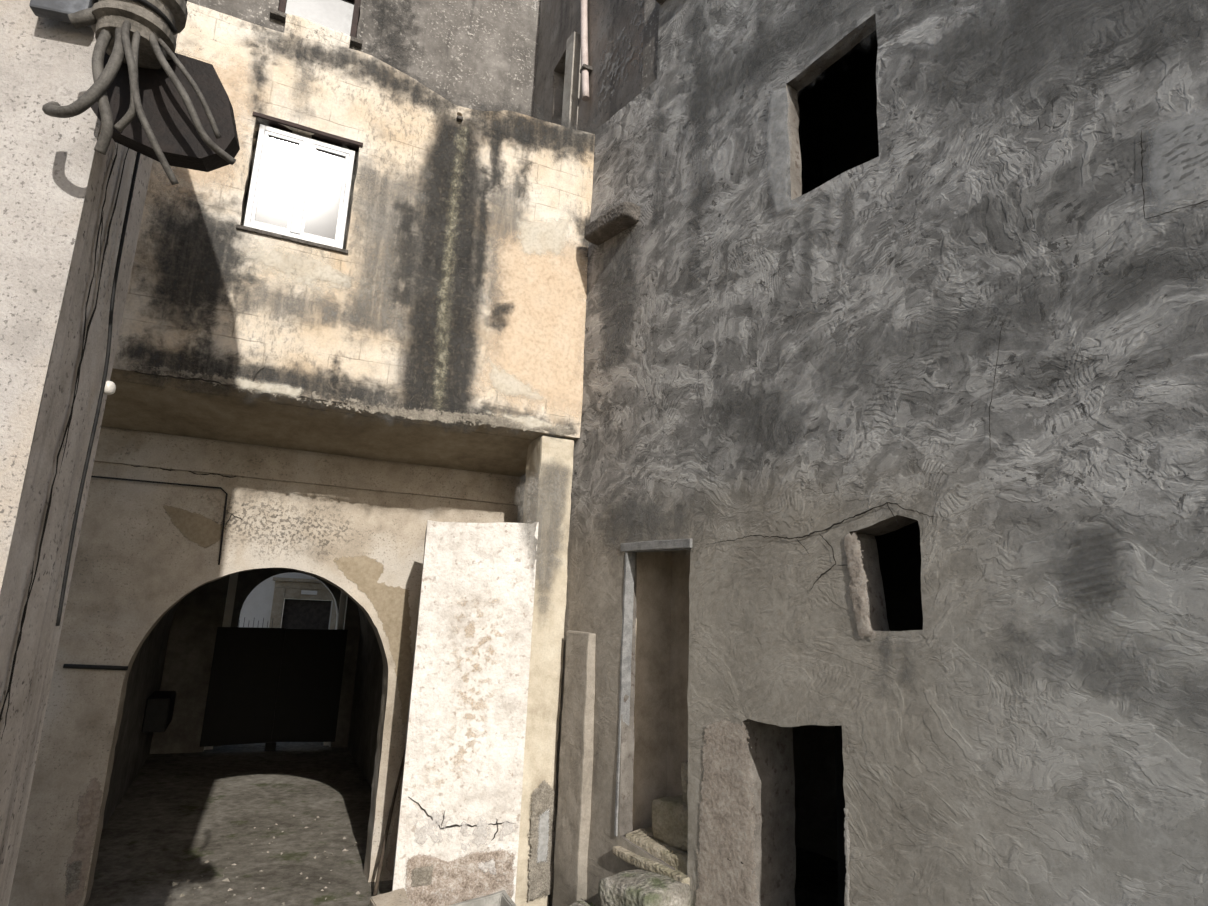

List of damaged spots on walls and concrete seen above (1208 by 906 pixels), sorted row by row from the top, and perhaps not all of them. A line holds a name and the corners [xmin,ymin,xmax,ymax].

leakage [123,0,595,434]
flaking render [163,505,225,548]
crack [711,502,934,590]
spalling [333,555,557,906]
crack [409,797,517,841]